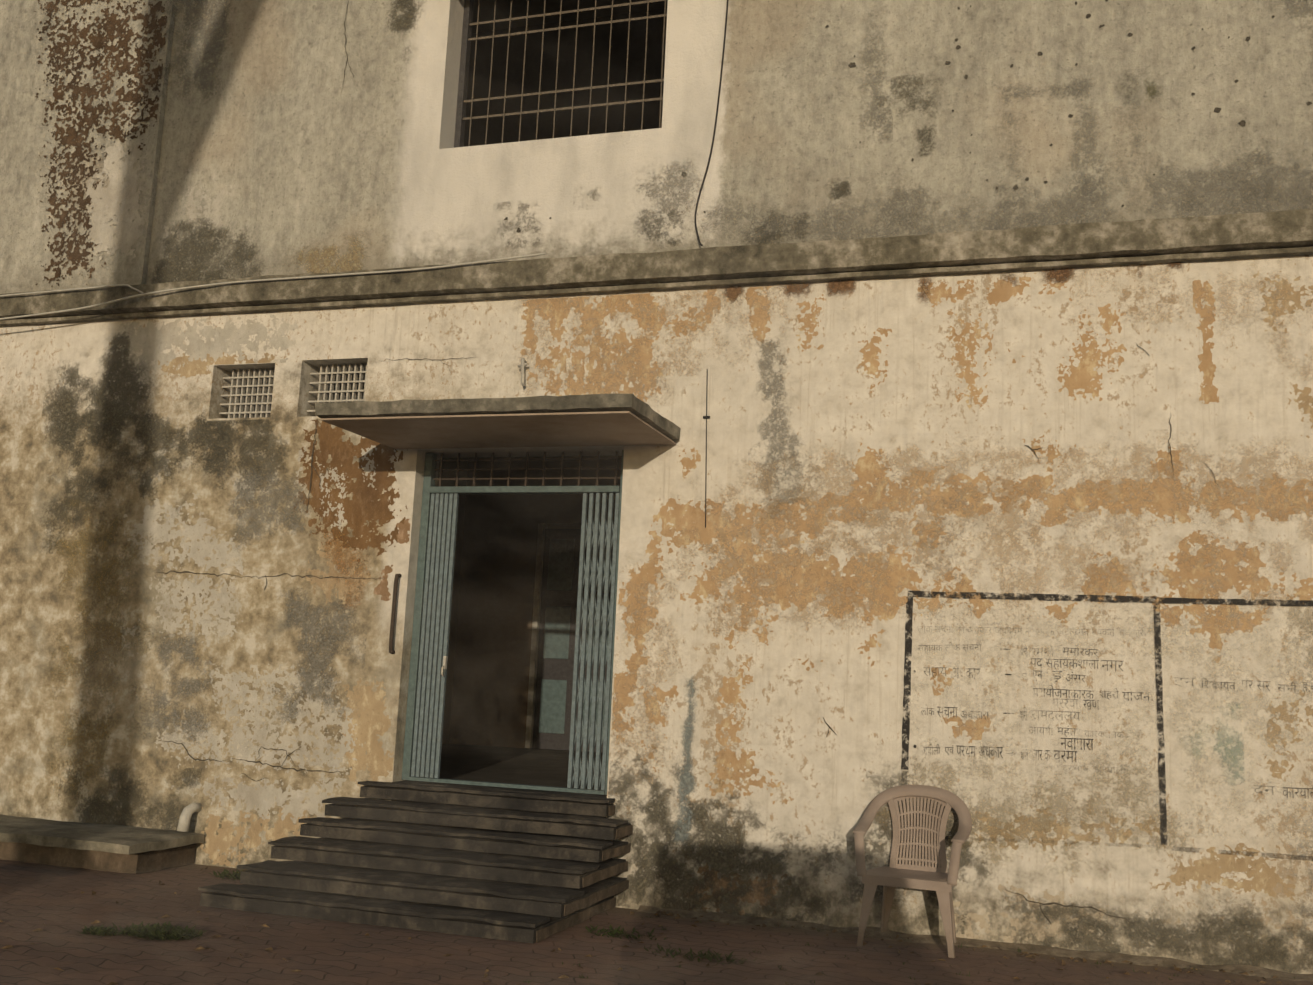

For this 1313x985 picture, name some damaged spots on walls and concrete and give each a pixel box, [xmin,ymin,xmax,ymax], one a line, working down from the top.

water stain [153,221,261,283]
peeling [520,286,772,402]
peeling [917,273,1127,410]
water stain [45,334,303,700]
peeling [0,493,394,874]
crack [156,570,378,590]
peeling [293,419,410,605]
peeling [612,434,1313,804]
water stain [64,713,184,831]
crack [165,741,342,782]
water stain [606,680,1017,922]
water stain [1010,904,1313,972]